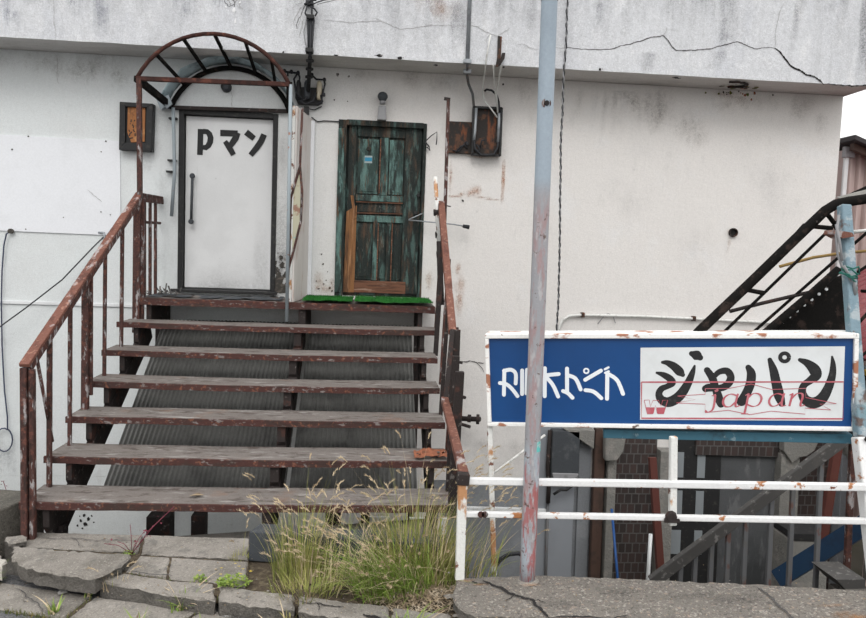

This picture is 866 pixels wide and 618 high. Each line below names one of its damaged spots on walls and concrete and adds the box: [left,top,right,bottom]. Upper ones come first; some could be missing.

crack [567,6,866,87]
crack [472,580,627,618]
crack [757,587,793,618]